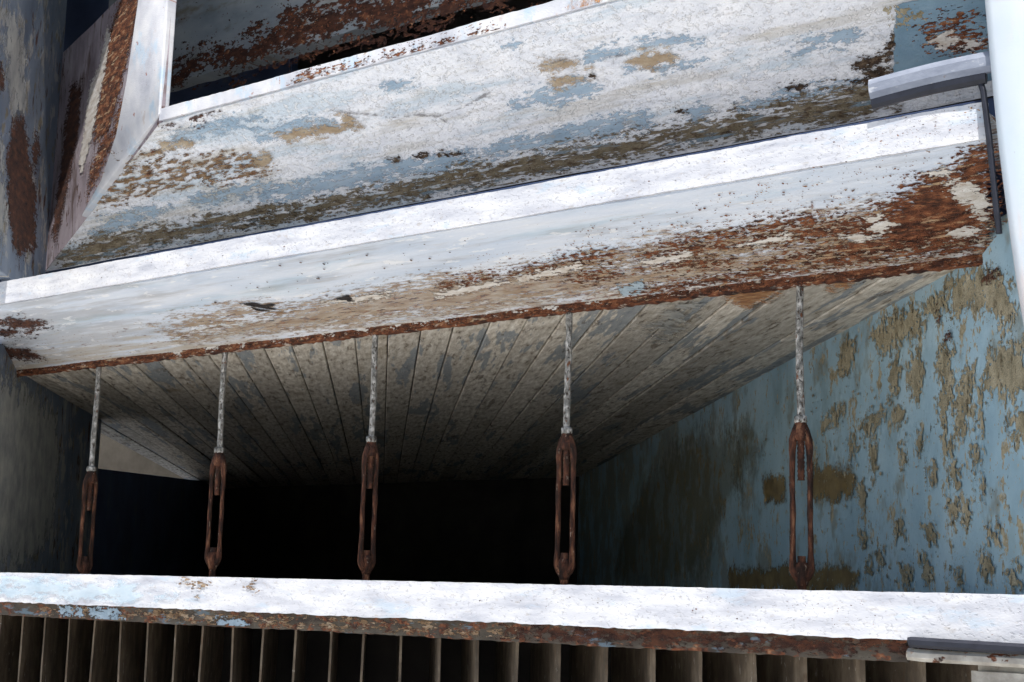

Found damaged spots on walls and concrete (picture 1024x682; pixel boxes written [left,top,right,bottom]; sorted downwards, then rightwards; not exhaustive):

corrosion [171,0,547,96]
corrosion [911,0,989,59]
corrosion [48,0,325,268]
peeling [170,0,989,232]
peeling [87,203,174,235]
corrosion [0,105,1007,372]
peeling [805,258,1024,595]
corrosion [38,604,90,618]
corrosion [118,607,940,658]